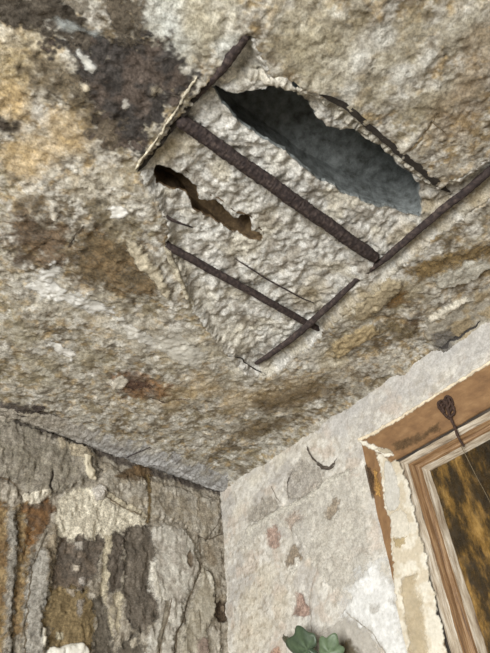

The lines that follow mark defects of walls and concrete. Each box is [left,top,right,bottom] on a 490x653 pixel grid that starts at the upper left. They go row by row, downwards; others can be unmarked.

peeling [77,50,96,73]
water stain [0,0,202,155]
spalling [135,36,490,379]
peeling [126,240,170,299]
rust [404,242,490,280]
rust [388,292,406,308]
crack [438,321,480,349]
crack [104,467,150,521]
crack [10,515,47,653]
crack [159,515,223,653]